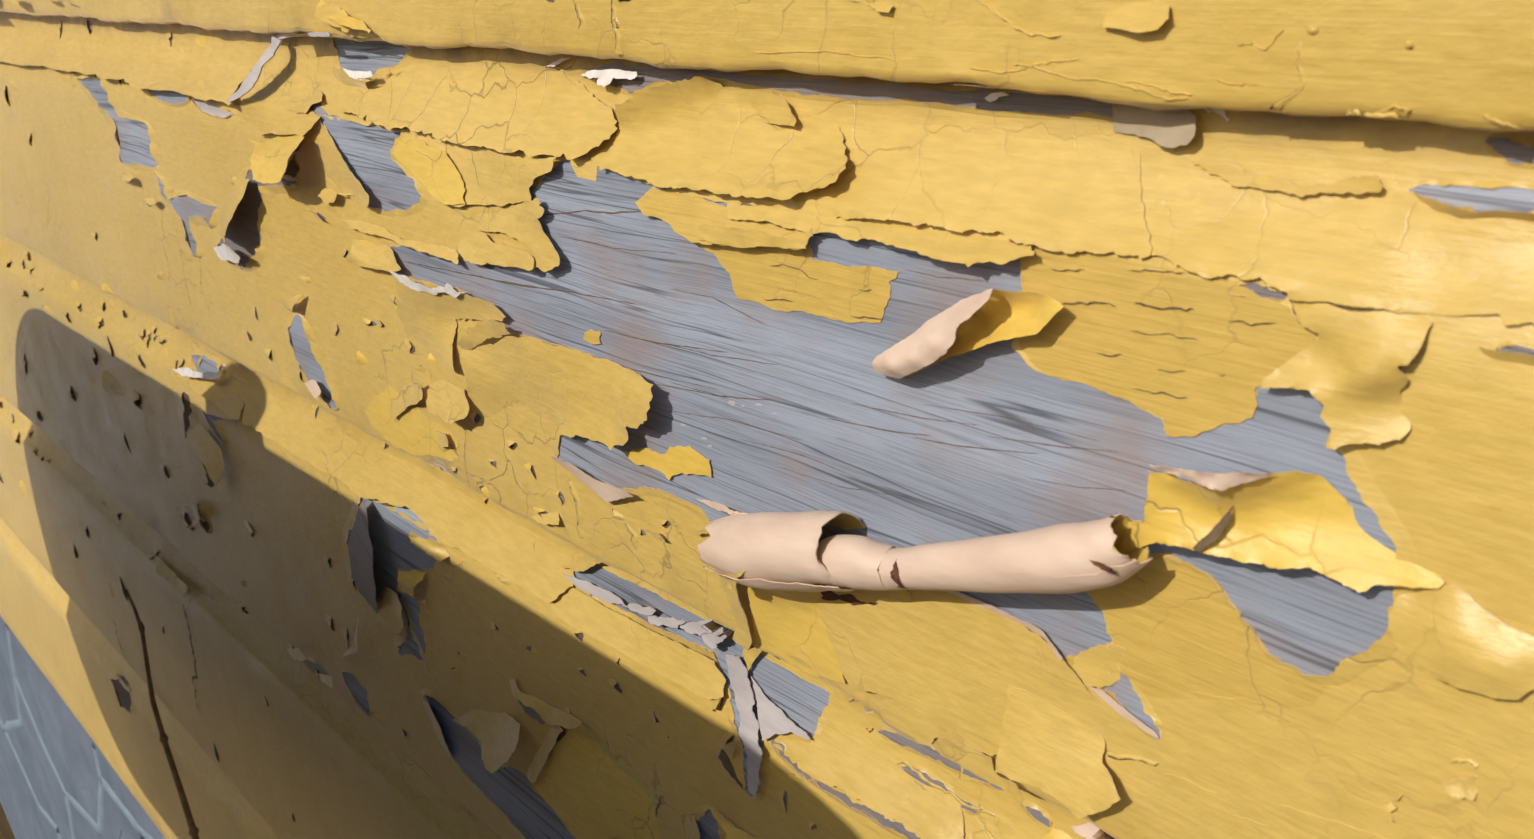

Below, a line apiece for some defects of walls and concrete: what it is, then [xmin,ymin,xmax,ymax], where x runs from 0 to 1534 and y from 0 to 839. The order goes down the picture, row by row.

crack [849,0,893,13]
crack [754,50,898,61]
crack [967,0,1306,110]
crack [1345,104,1411,121]
crack [1482,114,1534,147]
peeling [5,250,142,408]
peeling [137,326,168,355]
peeling [153,0,1534,593]
peeling [0,396,52,463]
crack [155,556,203,713]